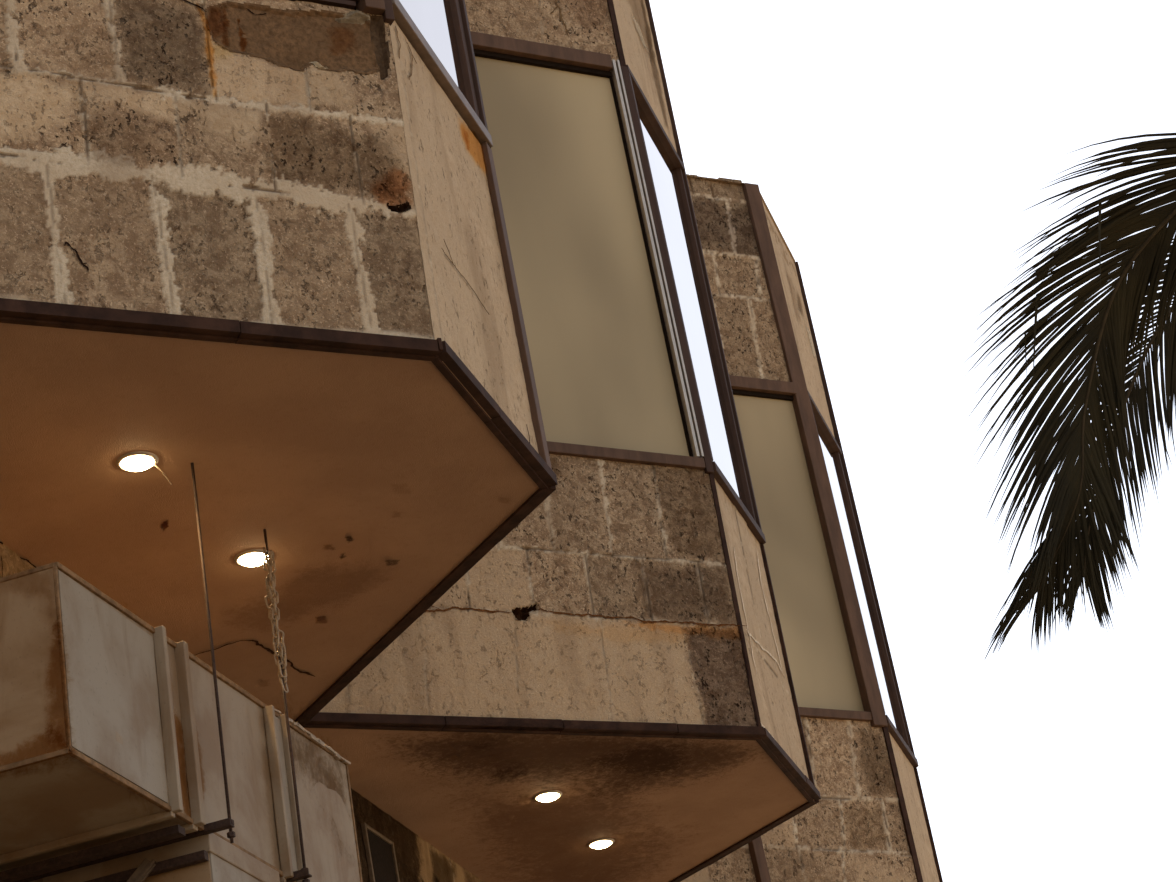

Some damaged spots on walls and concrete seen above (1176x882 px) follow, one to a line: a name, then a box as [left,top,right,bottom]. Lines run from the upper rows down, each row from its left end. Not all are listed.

peeling [205,1,390,79]
crack [425,549,785,678]
crack [194,640,315,677]